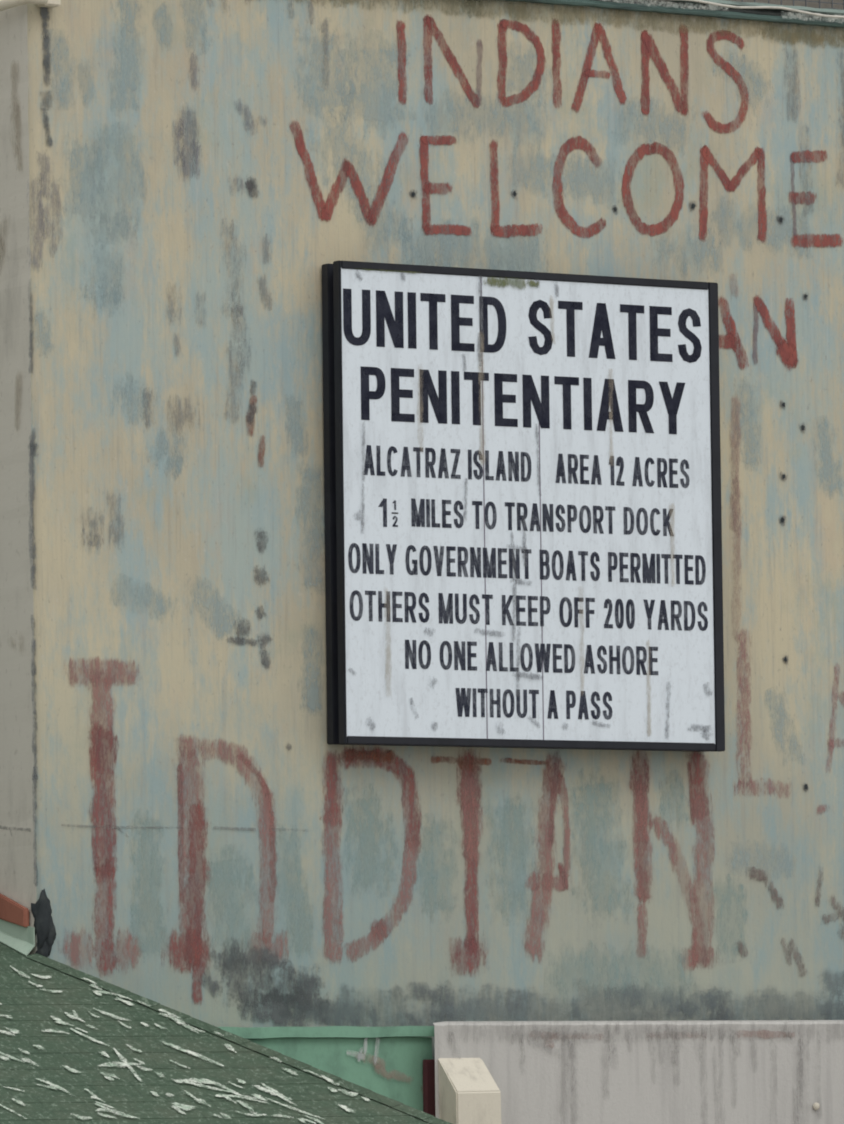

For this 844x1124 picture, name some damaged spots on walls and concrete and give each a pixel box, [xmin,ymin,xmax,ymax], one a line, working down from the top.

leakage [204,948,531,1062]
leakage [610,973,844,1021]